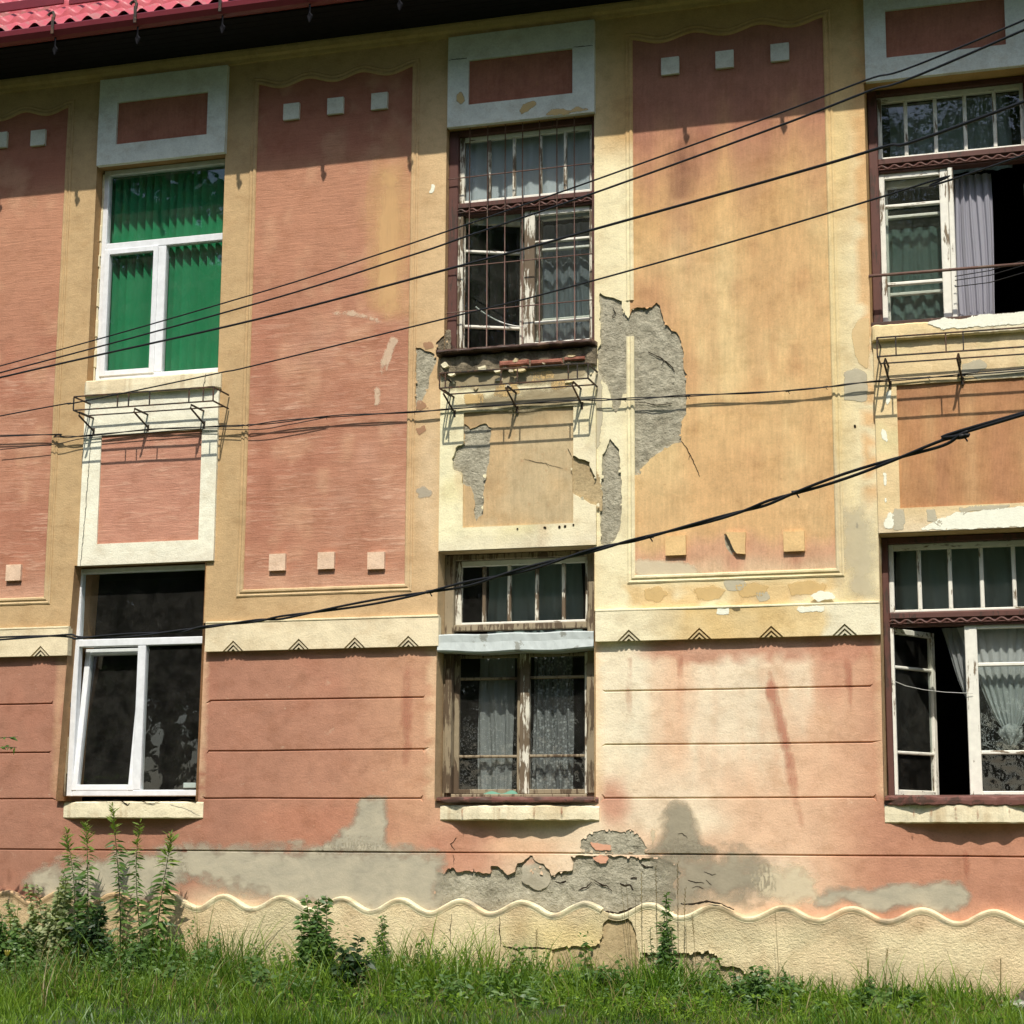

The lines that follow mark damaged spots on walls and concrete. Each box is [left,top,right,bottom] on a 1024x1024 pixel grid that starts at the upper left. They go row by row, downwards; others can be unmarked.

spalling [415,329,451,410]
spalling [598,294,687,475]
peeling [928,311,1024,330]
spalling [453,424,491,522]
spalling [571,439,622,545]
peeling [884,498,905,530]
peeling [921,504,1024,530]
peeling [694,580,770,615]
peeling [788,580,835,613]
leakage [766,681,791,780]
leakage [648,801,970,915]
spalling [434,829,747,988]